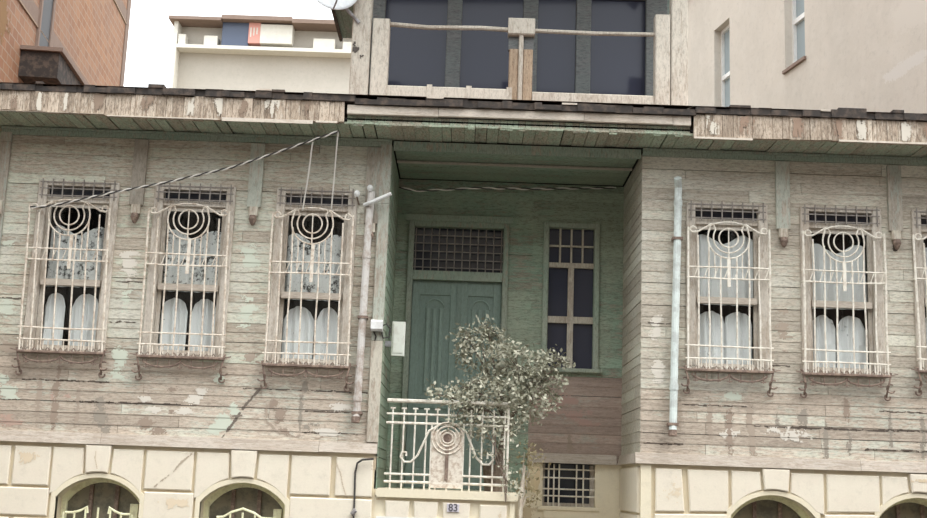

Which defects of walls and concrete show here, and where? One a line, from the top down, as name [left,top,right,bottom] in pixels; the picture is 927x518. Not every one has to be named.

peeling [239,243,262,268]
peeling [118,249,141,313]
peeling [0,298,18,318]
peeling [236,295,260,328]
peeling [108,345,129,381]
peeling [0,373,20,400]
peeling [138,396,161,414]
peeling [174,373,226,415]
peeling [206,402,240,435]
peeling [329,402,352,412]